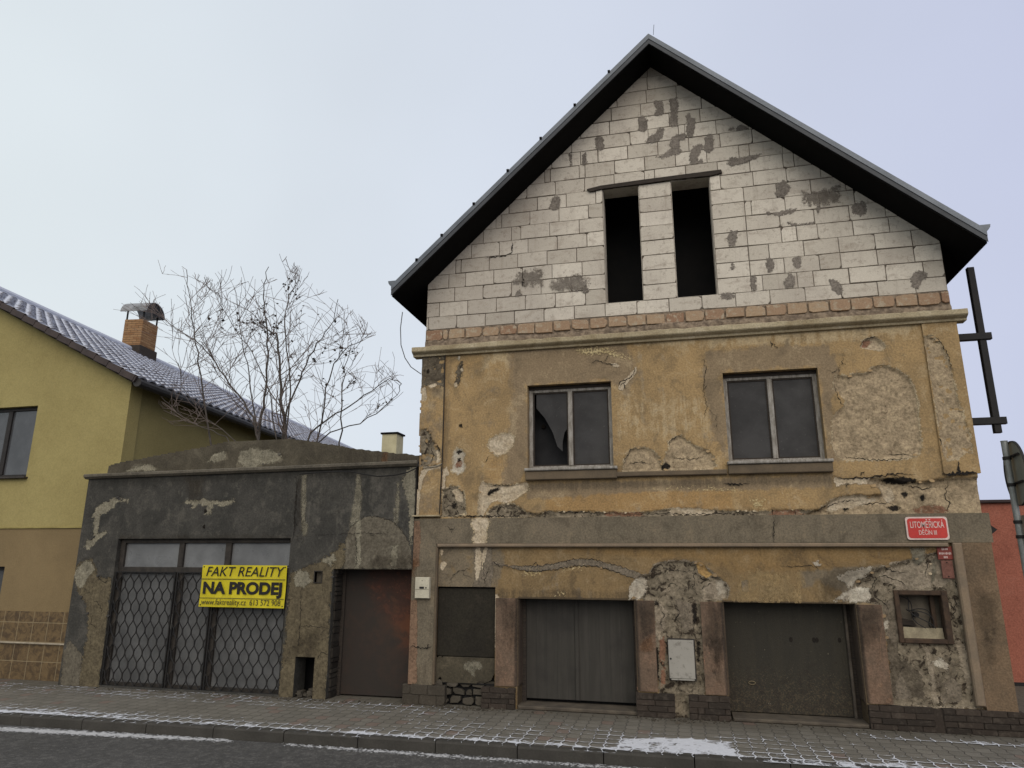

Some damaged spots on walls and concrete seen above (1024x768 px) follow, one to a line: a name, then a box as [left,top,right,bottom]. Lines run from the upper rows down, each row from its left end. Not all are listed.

flaking render [860,335,886,351]
flaking render [206,447,282,467]
flaking render [830,364,923,463]
flaking render [923,334,974,462]
peeling [60,496,129,687]
peeling [185,498,236,529]
damp [350,474,362,569]
crack [492,558,652,582]
flaking render [628,559,731,718]
flaking render [401,428,982,625]
flaking render [833,552,983,709]